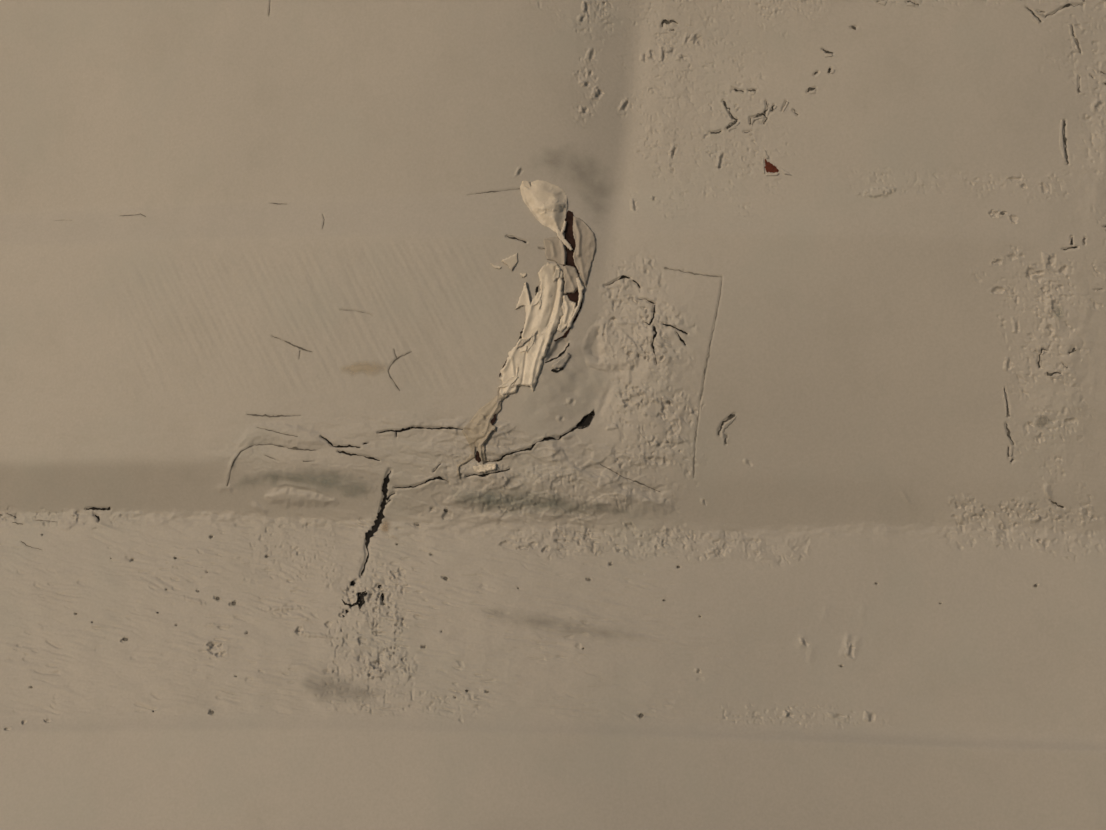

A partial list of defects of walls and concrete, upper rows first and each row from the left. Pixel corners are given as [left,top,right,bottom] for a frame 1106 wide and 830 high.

peeling [1024,0,1087,24]
spalling [570,32,607,128]
peeling [710,101,798,135]
flaking render [762,149,792,176]
peeling [1059,120,1069,164]
peeling [490,253,531,309]
peeling [520,180,579,332]
spalling [594,248,707,512]
spalling [991,248,1099,508]
peeling [718,414,737,444]
crack [227,414,576,576]
peeling [473,463,496,473]